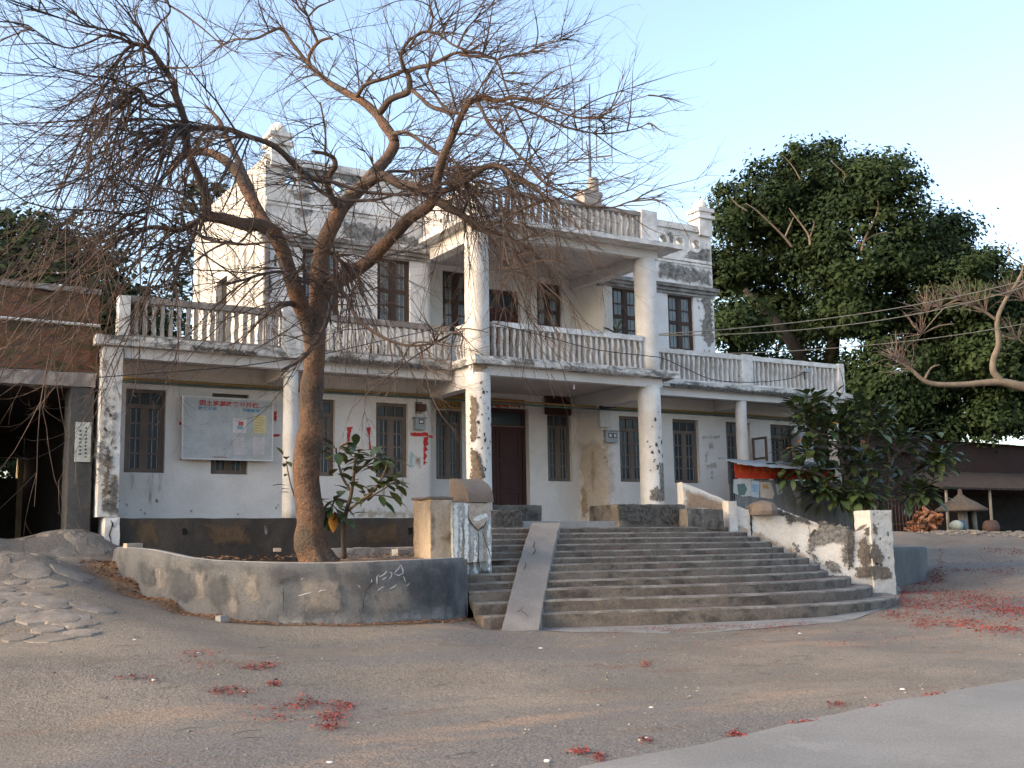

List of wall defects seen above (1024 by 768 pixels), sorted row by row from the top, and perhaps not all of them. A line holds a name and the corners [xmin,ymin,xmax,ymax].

peeling [697,298,715,352]
peeling [95,360,128,515]
spalling [469,364,491,480]
peeling [617,411,680,526]
spalling [792,512,892,580]